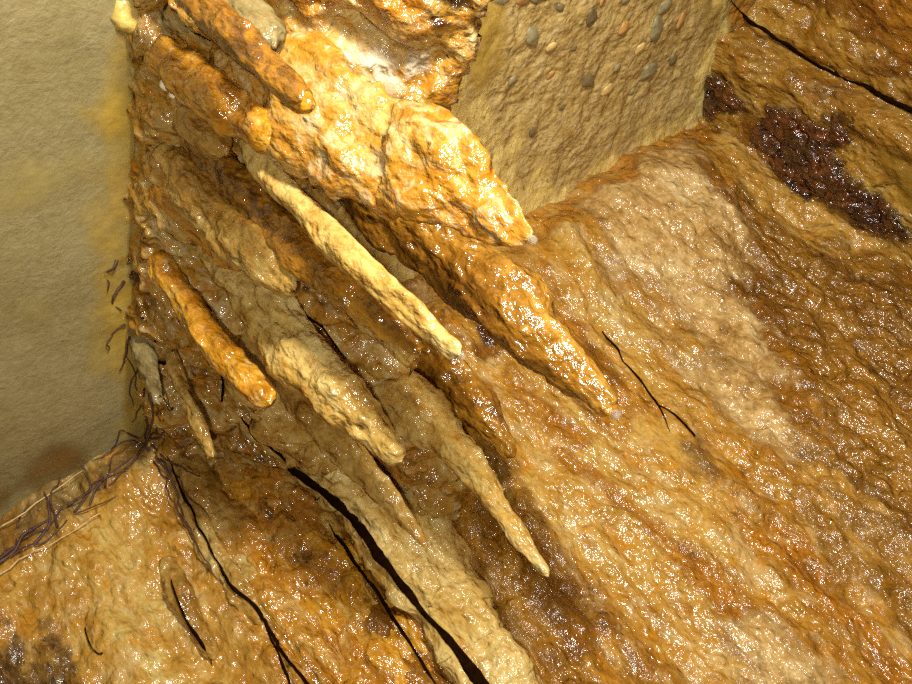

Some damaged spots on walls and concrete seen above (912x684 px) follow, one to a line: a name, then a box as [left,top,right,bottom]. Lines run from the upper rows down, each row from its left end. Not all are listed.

water stain [343,47,400,87]
water stain [405,48,429,76]
corrosion [728,0,756,30]
crack [730,0,912,113]
corrosion [793,0,912,75]
water stain [105,288,137,372]
crack [218,375,226,402]
crack [166,456,309,684]
water stain [221,463,454,684]
crack [241,418,490,684]
water stain [473,442,603,684]